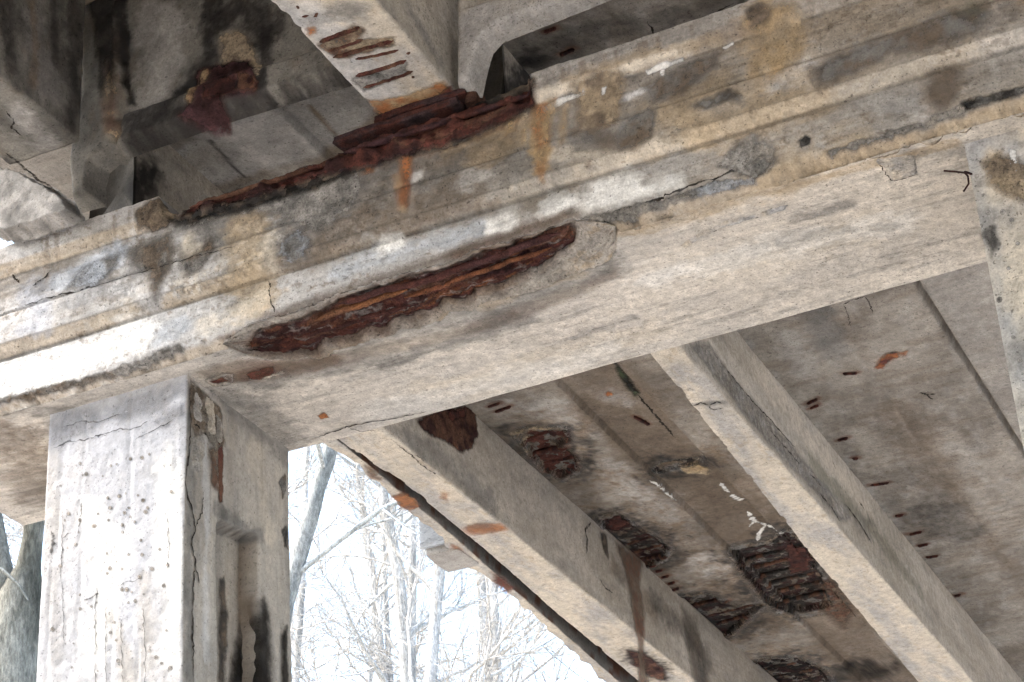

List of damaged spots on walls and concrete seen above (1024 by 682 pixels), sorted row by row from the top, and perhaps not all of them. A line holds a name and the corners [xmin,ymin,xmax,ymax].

damp [89,0,136,137]
spalling [69,78,535,293]
rust [400,155,411,206]
spalling [223,134,788,380]
crack [619,169,734,210]
rust [874,351,907,369]
spalling [418,406,478,454]
crack [50,503,146,682]
crack [167,424,207,677]
damp [219,577,289,682]
rust [601,533,649,682]
spalling [593,510,852,639]